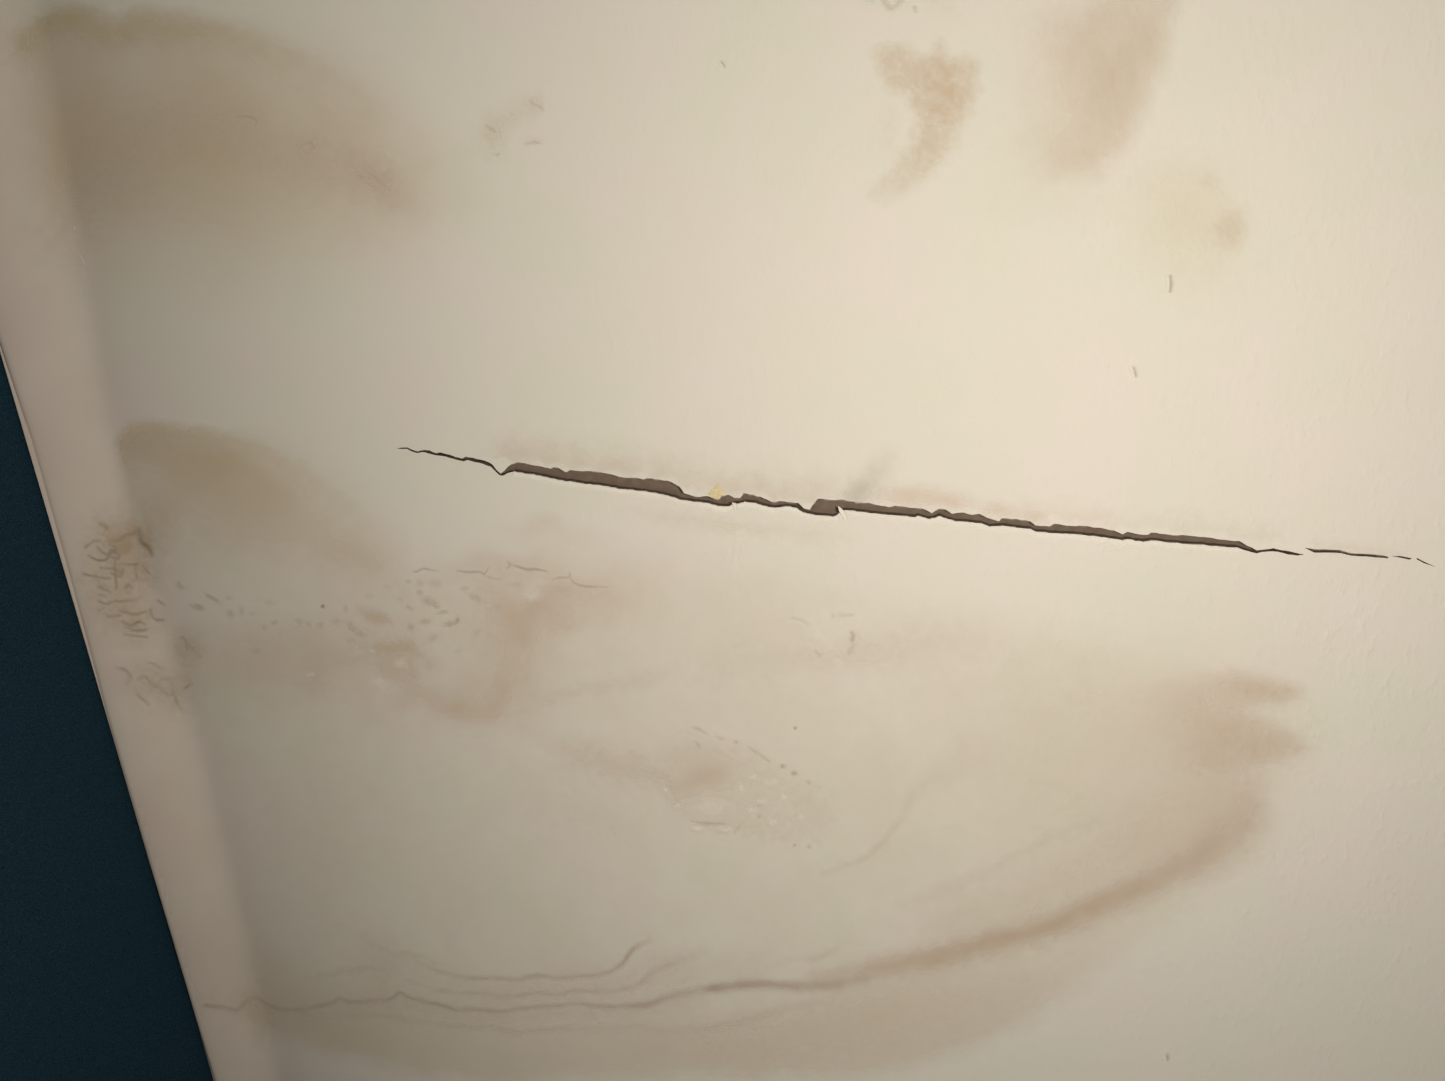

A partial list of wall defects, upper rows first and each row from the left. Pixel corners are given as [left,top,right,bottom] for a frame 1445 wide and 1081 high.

damp [123,429,294,525]
crack [397,447,1435,567]
damp [867,718,1290,973]
damp [701,981,798,991]